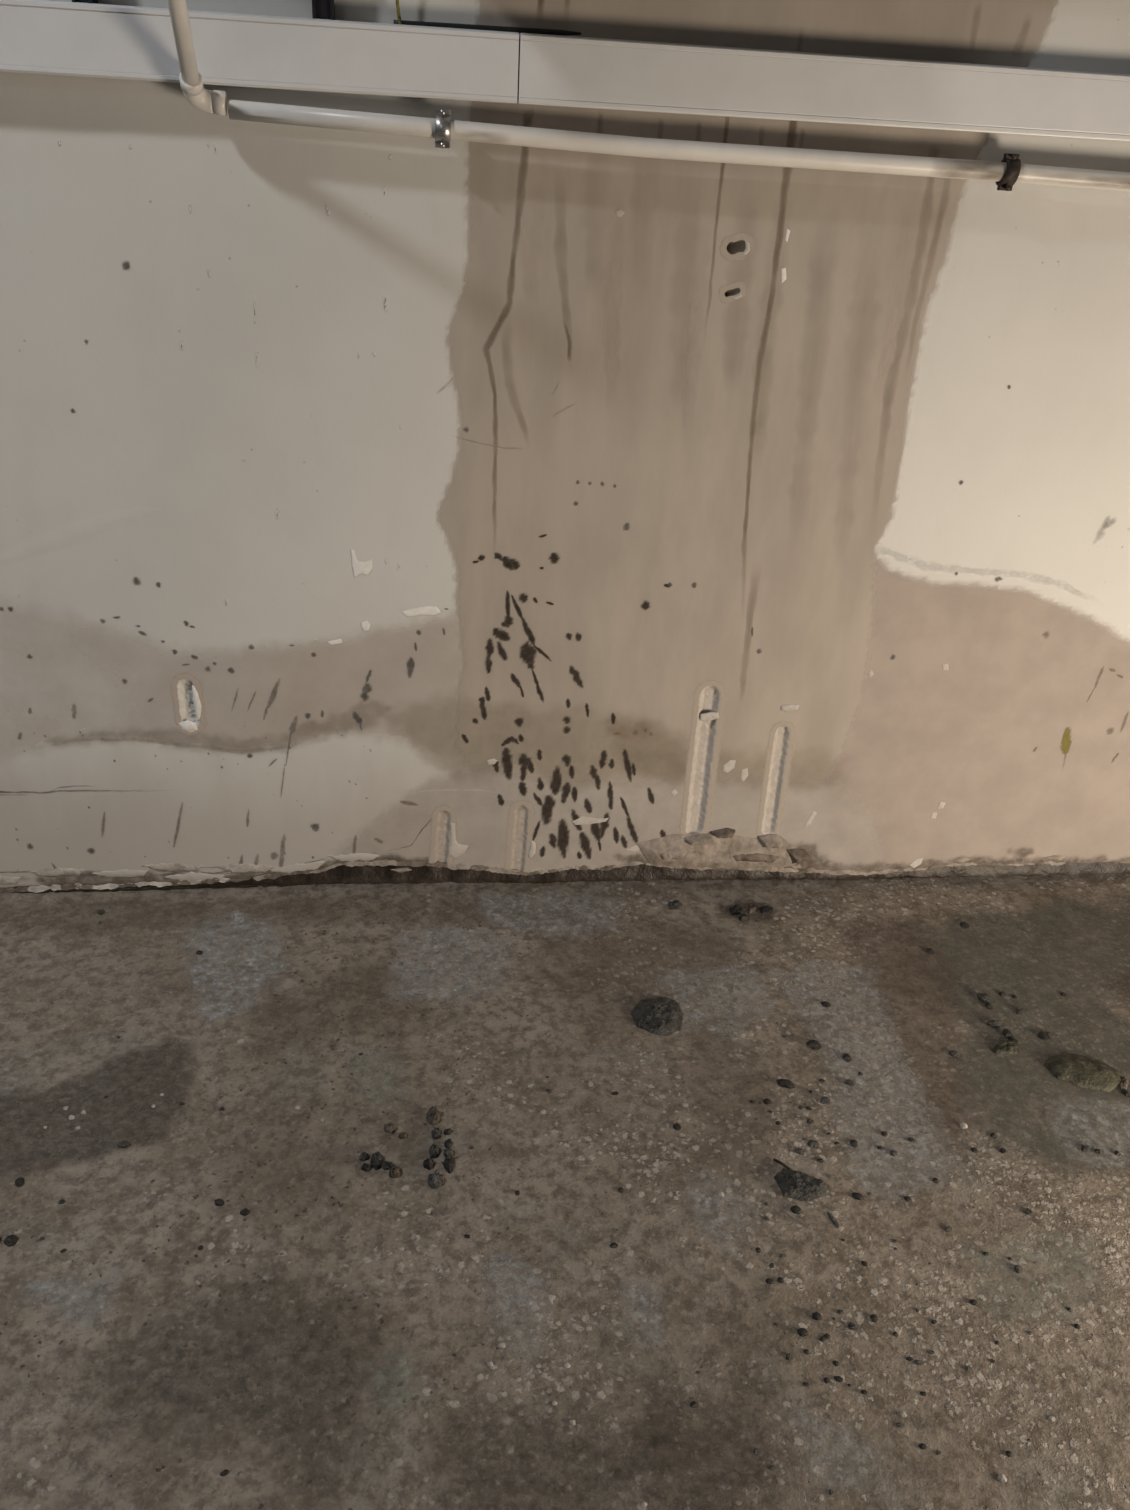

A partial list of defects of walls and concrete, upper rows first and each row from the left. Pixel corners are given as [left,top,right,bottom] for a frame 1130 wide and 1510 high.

damp [476,0,1057,67]
damp [146,101,1130,872]
flaking render [0,823,1066,894]